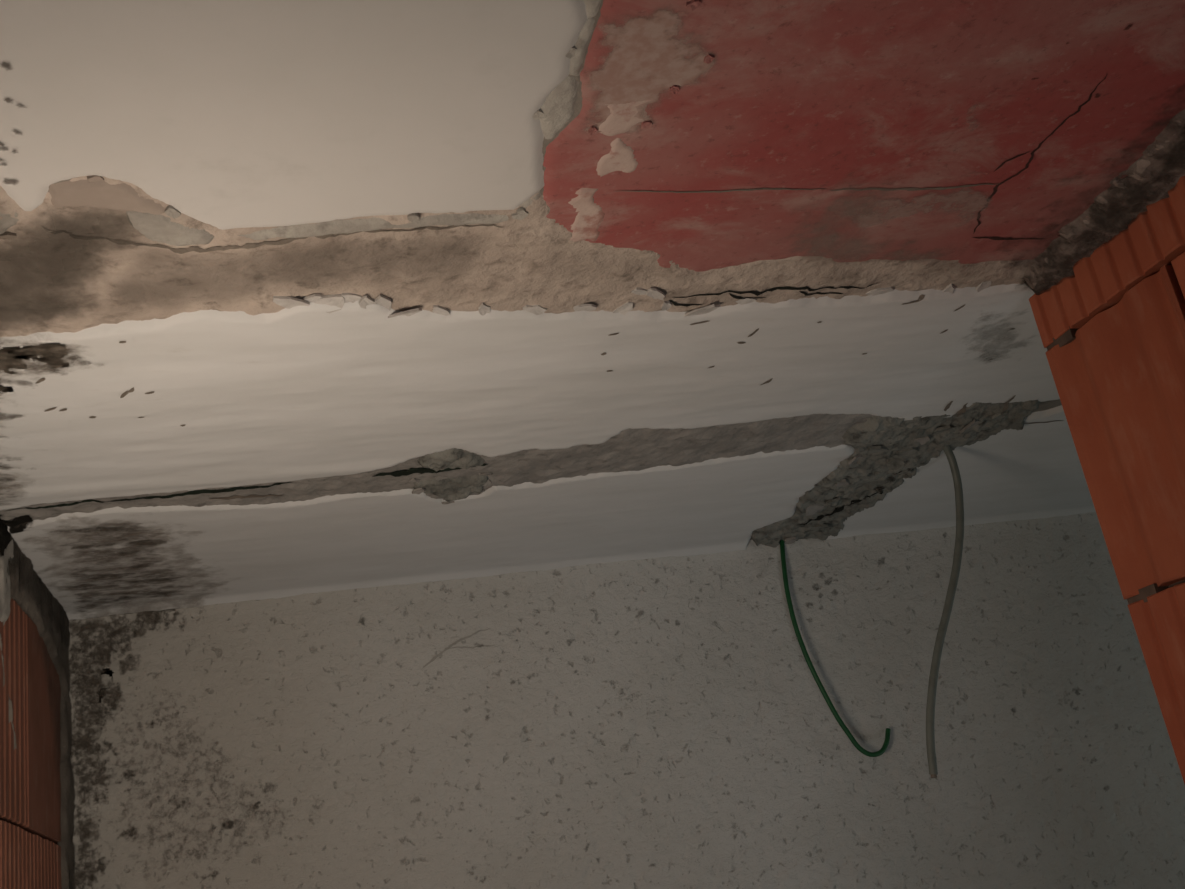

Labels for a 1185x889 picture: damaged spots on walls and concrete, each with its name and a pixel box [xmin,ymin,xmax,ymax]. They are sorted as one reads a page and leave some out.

peeling [0,0,1029,337]
crack [615,75,1107,240]
peeling [0,395,1054,556]
leakage [68,524,182,889]